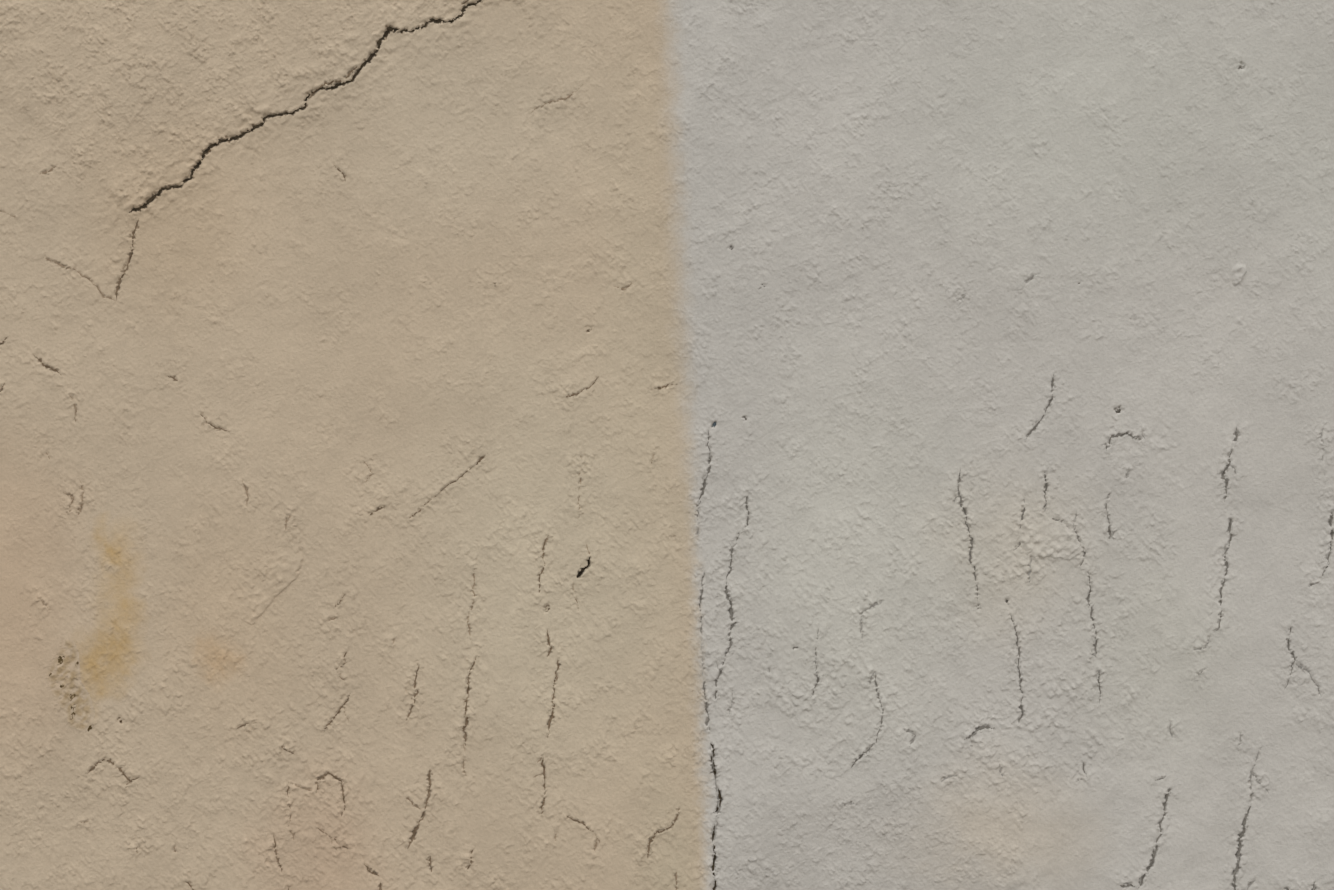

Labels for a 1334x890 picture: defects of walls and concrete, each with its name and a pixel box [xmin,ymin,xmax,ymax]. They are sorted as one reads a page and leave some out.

crack [43,0,482,301]
crack [573,544,590,609]
crack [954,473,978,599]
crack [1013,429,1145,702]
crack [1193,427,1238,675]
crack [274,746,382,890]
crack [401,770,473,872]
crack [456,560,476,773]
crack [534,633,600,851]
crack [964,617,1023,776]
crack [1118,778,1171,888]
crack [1233,733,1269,890]